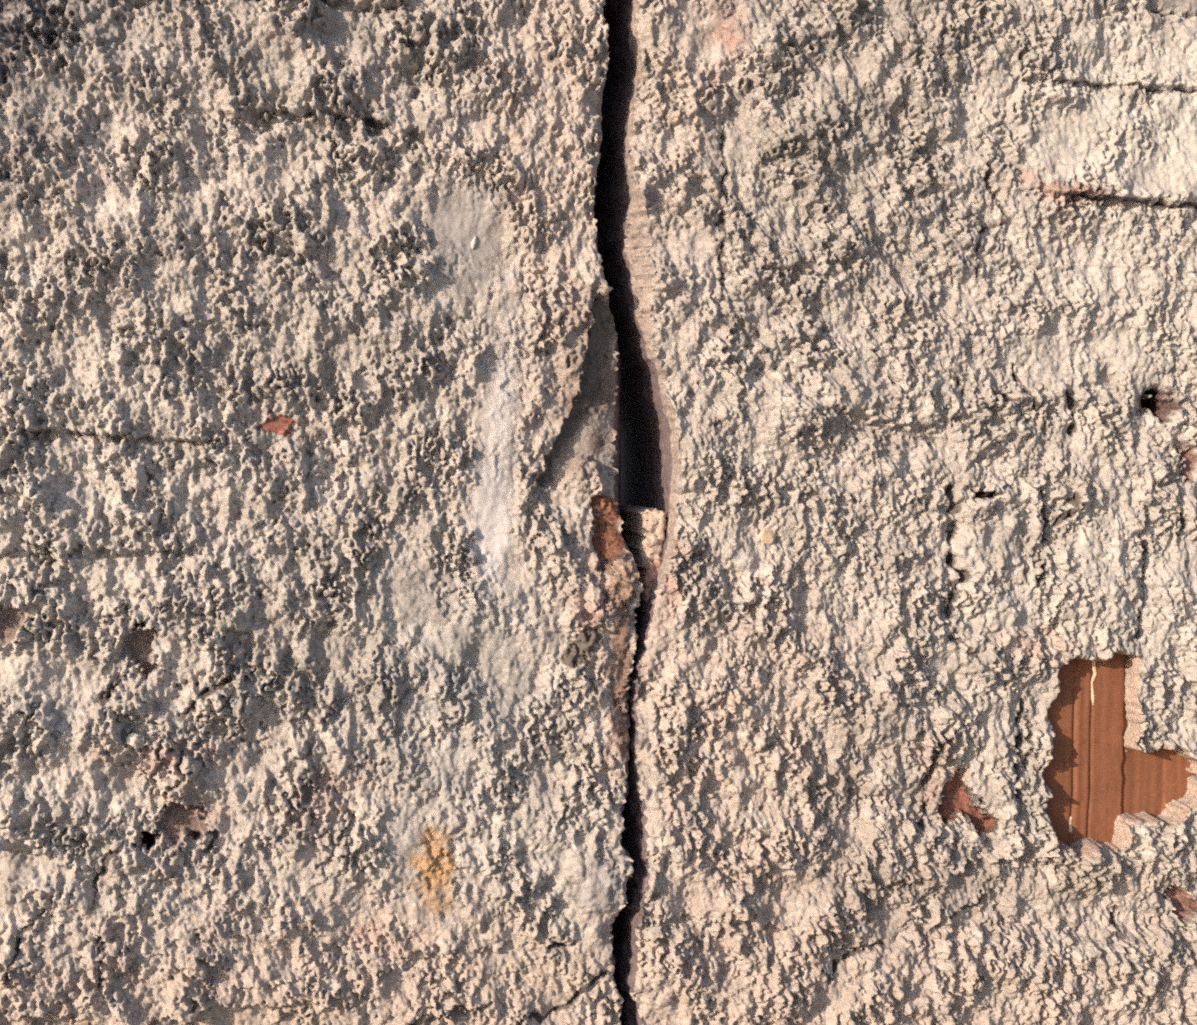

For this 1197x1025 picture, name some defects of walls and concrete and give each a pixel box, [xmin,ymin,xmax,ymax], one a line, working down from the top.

crack [975,159,1197,287]
crack [518,0,682,1025]
spalling [938,762,1000,841]
spalling [1042,651,1197,859]